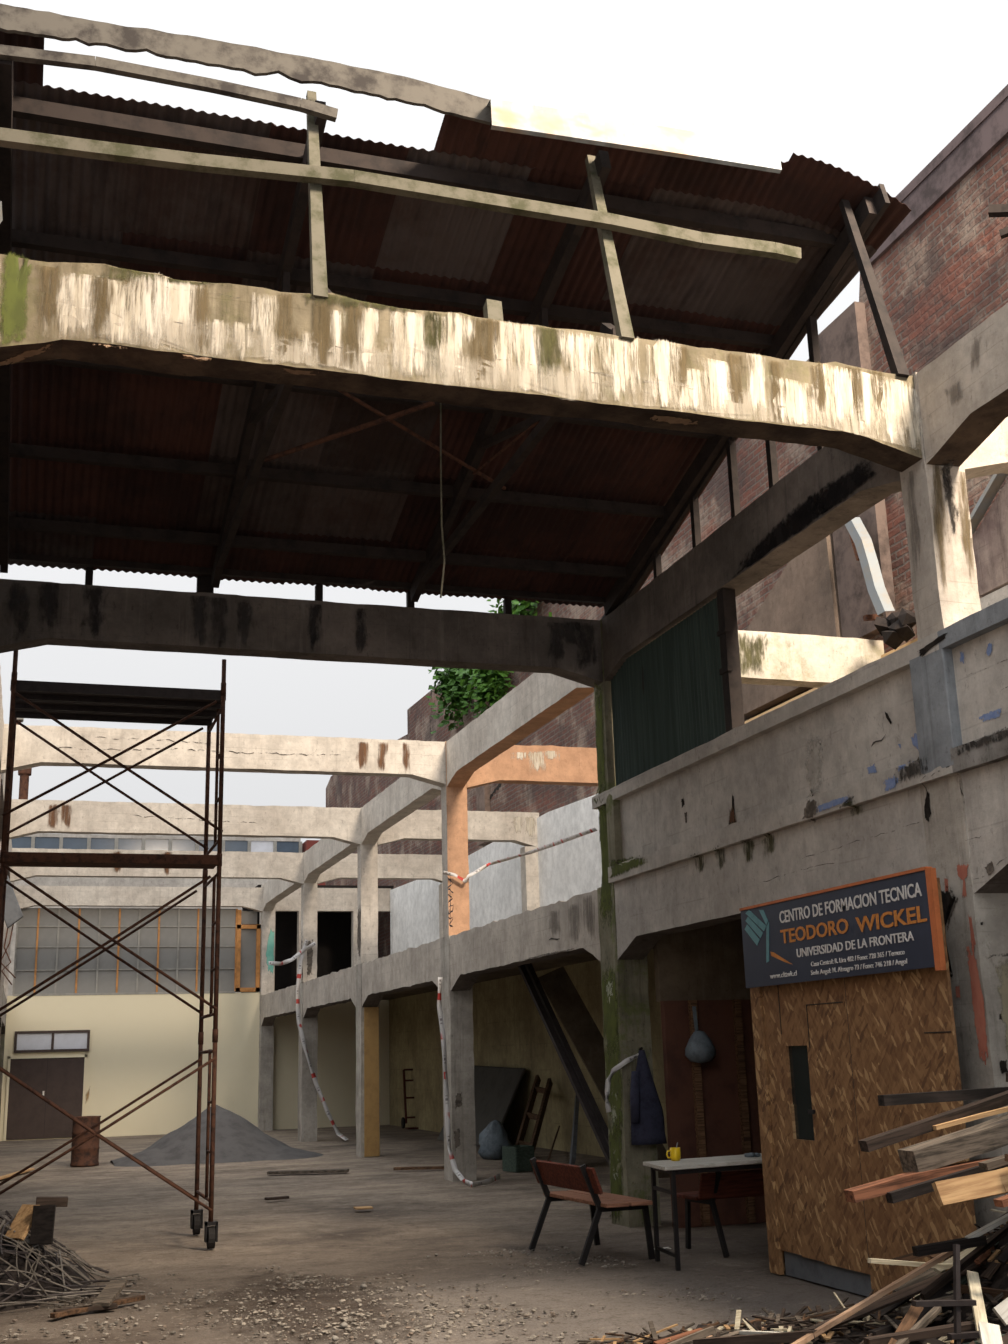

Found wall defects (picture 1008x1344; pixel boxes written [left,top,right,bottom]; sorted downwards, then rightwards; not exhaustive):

water stain [40,266,923,448]
water stain [909,459,973,586]
water stain [8,583,59,633]
water stain [82,587,102,635]
water stain [192,595,252,648]
water stain [309,604,321,648]
water stain [356,610,366,650]
spalling [917,633,947,657]
corrosion [357,742,410,770]
peeling [867,712,918,791]
spalling [920,781,931,822]
peeling [941,864,1008,1074]